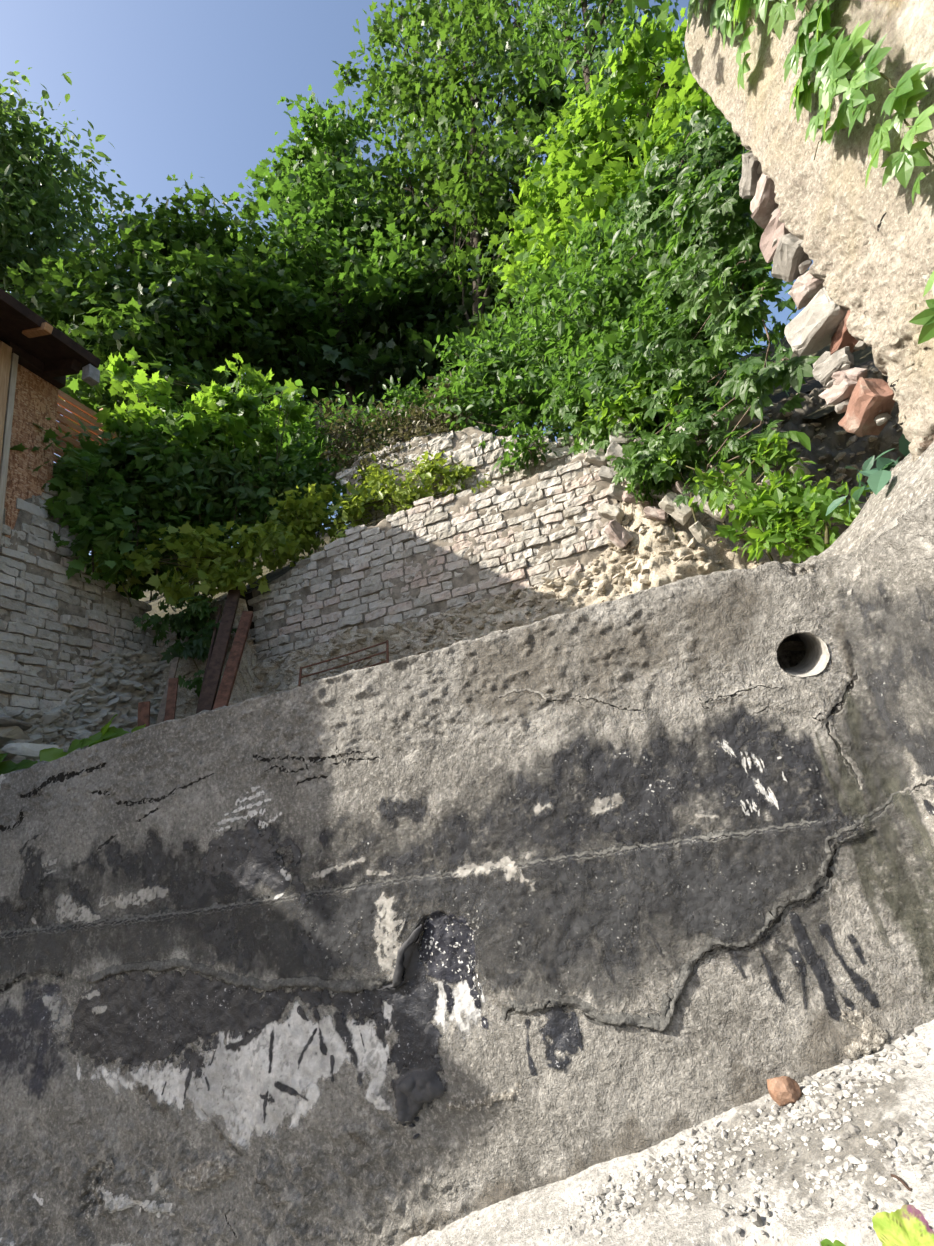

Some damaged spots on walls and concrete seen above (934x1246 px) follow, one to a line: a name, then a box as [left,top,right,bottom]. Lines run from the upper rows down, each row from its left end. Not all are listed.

peeling [591,794,623,814]
peeling [56,886,168,924]
crack [0,671,934,1032]
peeling [453,853,535,891]
damp [798,732,934,1011]
damp [119,1028,308,1127]
peeling [76,892,427,1148]
damp [286,1005,389,1086]
damp [441,975,454,1014]
peeling [433,980,485,1032]
damp [464,971,488,1029]
damp [760,940,807,1009]